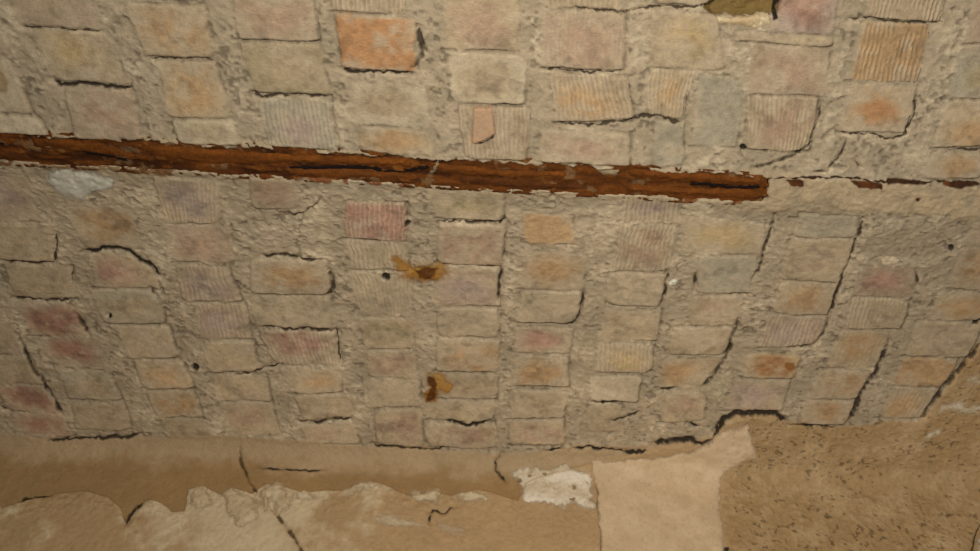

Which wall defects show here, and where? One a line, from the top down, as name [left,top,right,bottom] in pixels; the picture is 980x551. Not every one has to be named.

spalling [717,11,770,28]
crack [850,15,938,23]
corrosion [0,138,587,190]
corrosion [621,169,765,203]
crack [755,99,979,201]
crack [9,234,88,330]
crack [87,245,160,291]
corrosion [392,256,447,281]
crack [800,220,863,347]
corrosion [424,373,453,402]
crack [850,349,886,416]
crack [549,409,828,454]